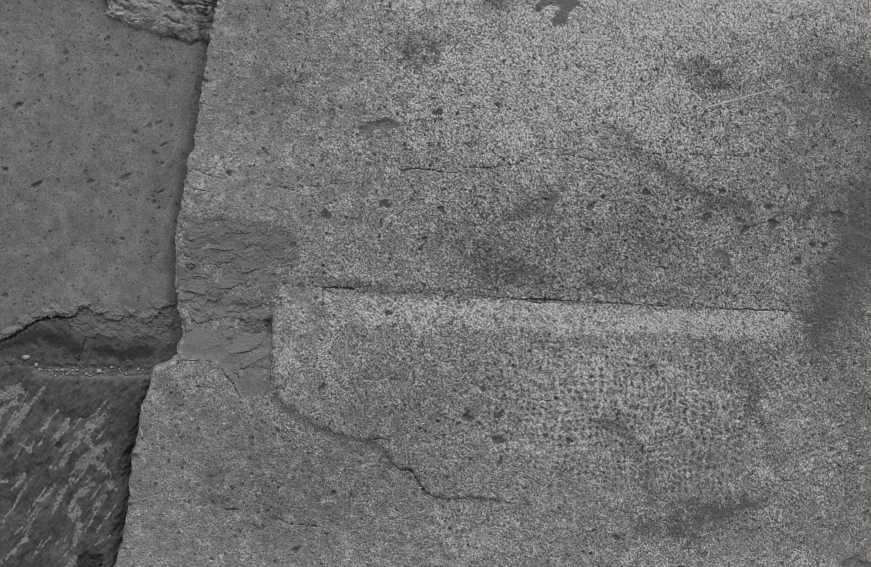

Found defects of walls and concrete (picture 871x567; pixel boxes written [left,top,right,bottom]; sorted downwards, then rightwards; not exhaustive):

crack [395,146,605,174]
spalling [0,208,303,394]
crack [369,437,515,519]